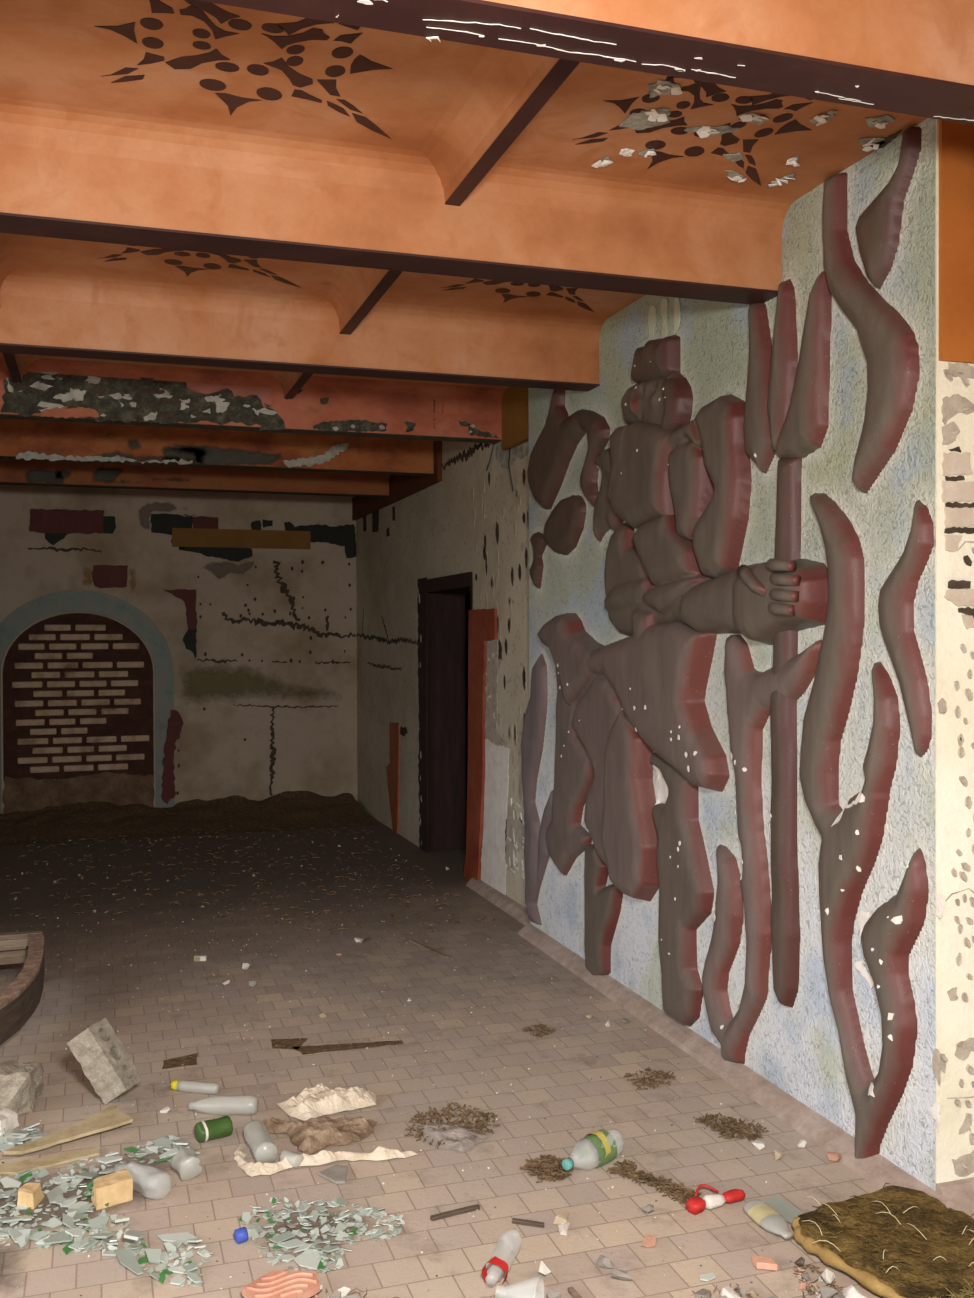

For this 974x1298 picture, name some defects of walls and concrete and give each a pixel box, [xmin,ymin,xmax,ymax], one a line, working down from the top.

peeling [423,19,745,130]
peeling [684,113,770,138]
peeling [592,148,657,168]
peeling [723,153,746,183]
peeling [767,156,800,188]
peeling [187,383,303,406]
peeling [41,406,100,419]
crack [222,560,418,671]
crack [233,704,337,796]